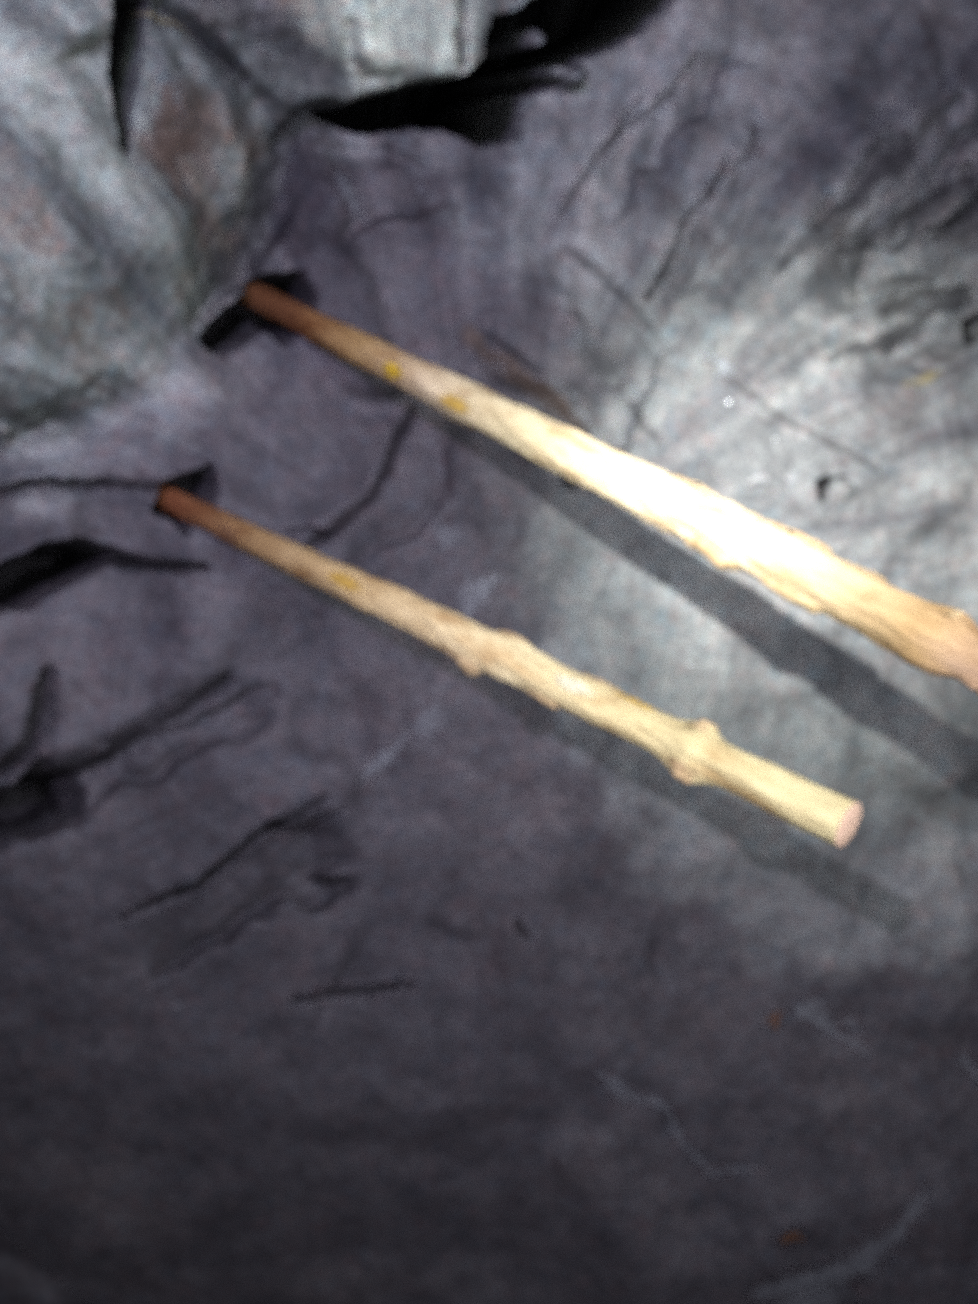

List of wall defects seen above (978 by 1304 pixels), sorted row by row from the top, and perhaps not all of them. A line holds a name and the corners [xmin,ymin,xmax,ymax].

crack [107,0,244,93]
crack [310,0,603,133]
crack [0,544,199,603]
crack [0,672,227,828]